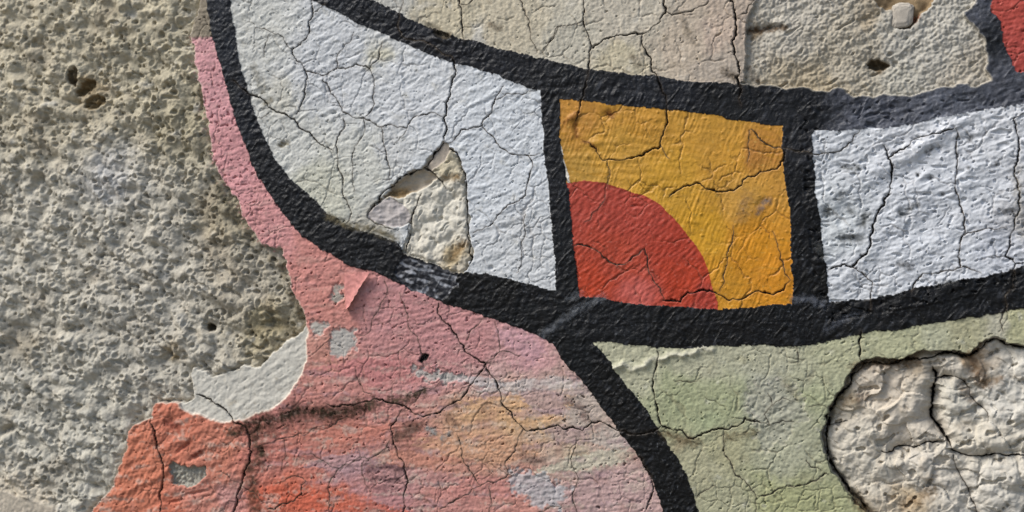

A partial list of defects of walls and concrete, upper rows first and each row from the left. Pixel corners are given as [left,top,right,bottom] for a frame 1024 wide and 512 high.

flaking render [742,0,992,98]
crack [150,418,165,511]
flaking render [169,462,207,488]
peeling [179,319,359,423]
peeling [329,272,370,311]
crack [232,0,540,271]
flaking render [367,142,474,301]
crack [196,114,1024,512]
crack [520,0,790,302]
flaking render [821,337,1024,512]